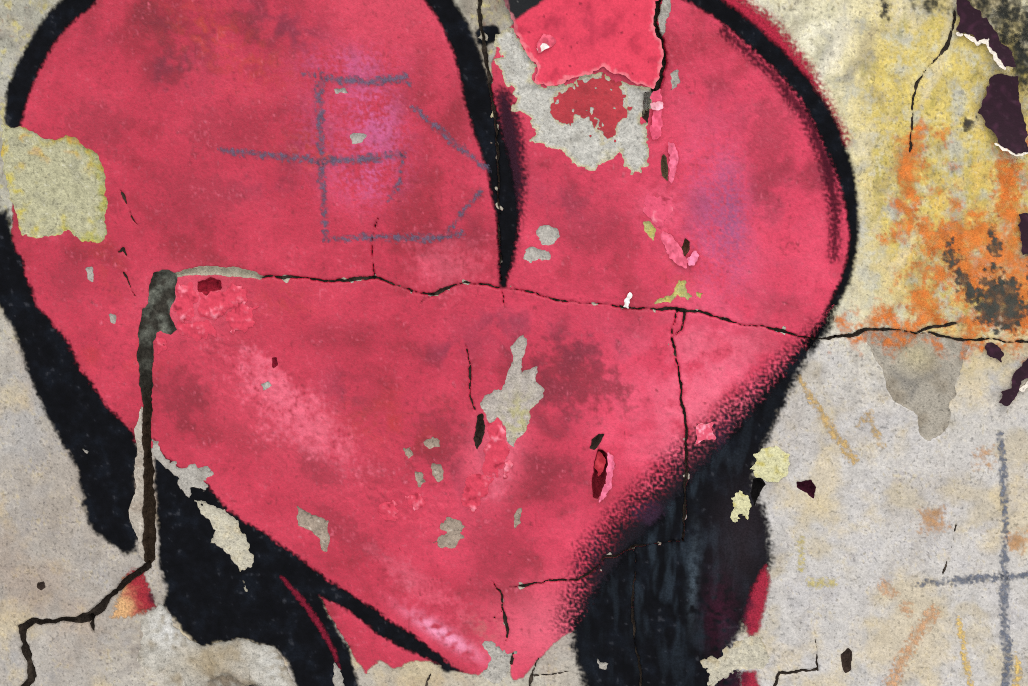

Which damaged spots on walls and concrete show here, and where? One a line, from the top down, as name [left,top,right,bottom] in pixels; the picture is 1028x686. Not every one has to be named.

peeling [494,0,680,175]
water stain [924,0,938,12]
peeling [956,0,1028,156]
water stain [967,0,1028,86]
peeling [1,125,108,243]
rust [835,125,1028,352]
peeling [1018,213,1028,255]
crack [18,0,567,686]
peeling [152,439,254,592]
peeling [461,335,545,513]
hole [750,478,766,505]
crack [494,302,1028,686]